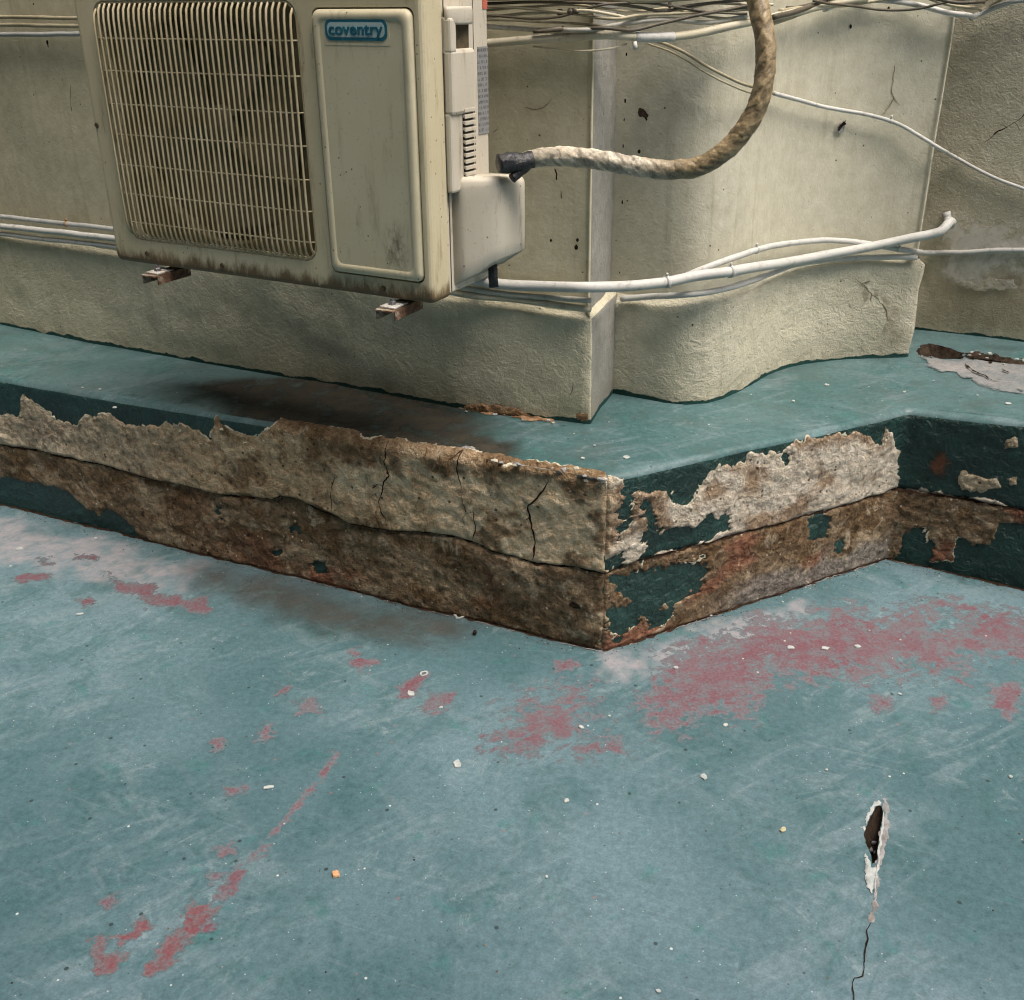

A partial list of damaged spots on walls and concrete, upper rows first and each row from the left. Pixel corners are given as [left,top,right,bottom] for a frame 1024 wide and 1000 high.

leakage [198,378,513,456]
spalling [914,343,1024,394]
crack [0,441,1024,574]
crack [0,504,1024,652]
peeling [0,395,1024,767]
crack [852,798,891,1000]